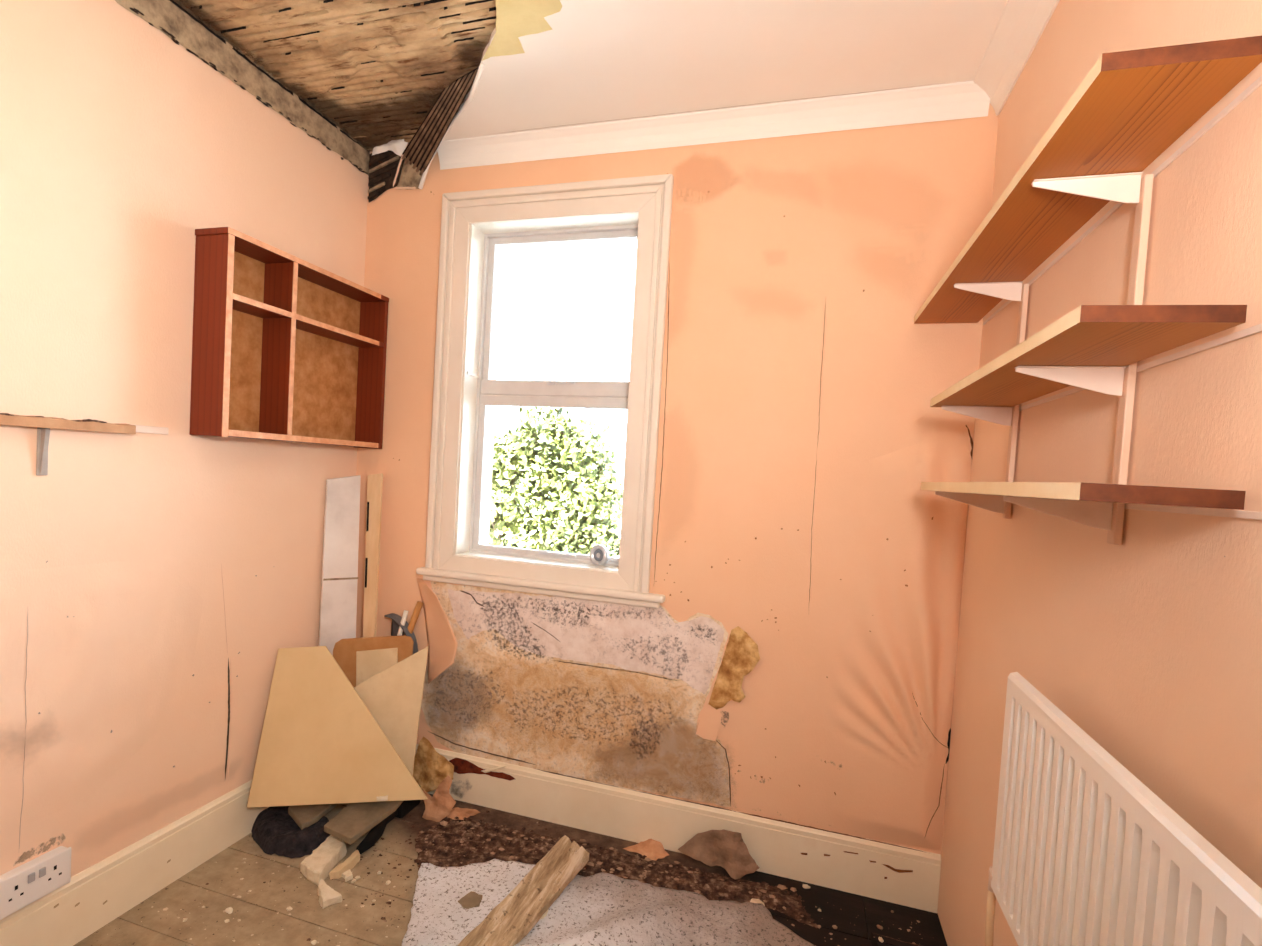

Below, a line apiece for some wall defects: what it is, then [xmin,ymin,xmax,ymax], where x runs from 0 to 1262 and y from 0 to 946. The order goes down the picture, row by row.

spalling [130,8,368,174]
peeling [417,578,760,807]